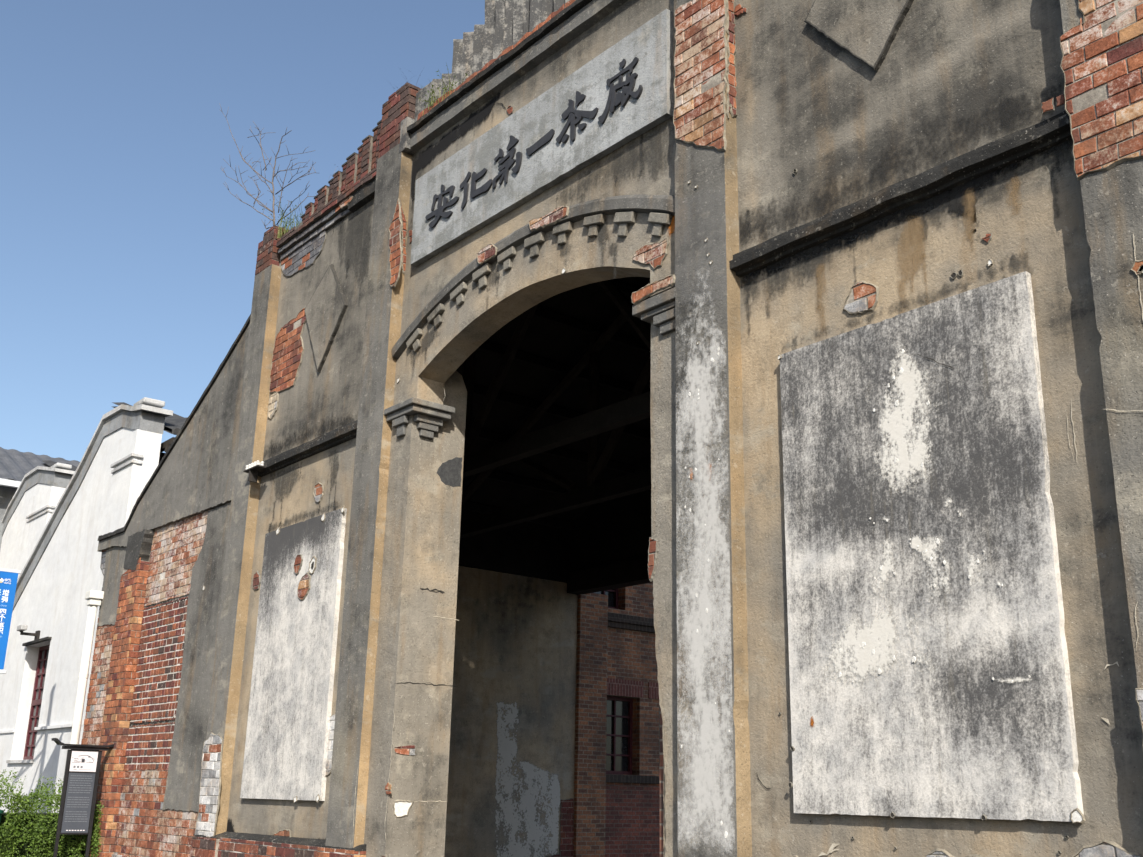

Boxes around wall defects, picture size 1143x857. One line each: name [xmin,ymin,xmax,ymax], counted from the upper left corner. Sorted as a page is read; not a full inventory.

spalling [267,308,306,420]
spalling [631,238,676,305]
spalling [673,0,748,152]
spalling [843,281,879,315]
leakage [739,84,1061,243]
leakage [741,139,1073,331]
spalling [1041,0,1143,181]
crack [1133,234,1143,319]
flaking render [81,550,115,745]
flaking render [111,510,224,857]
spalling [385,782,414,818]
peeling [495,702,574,857]